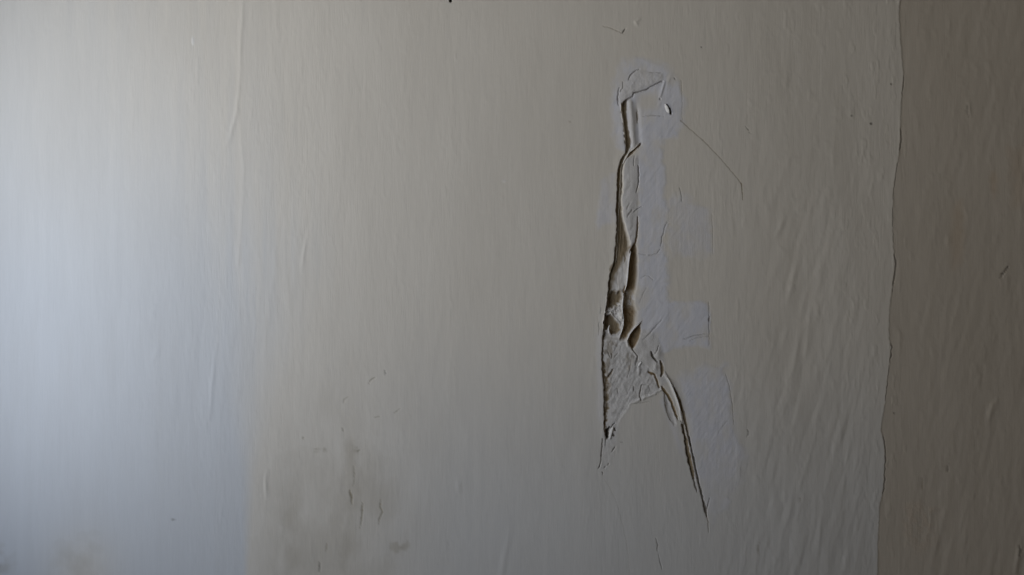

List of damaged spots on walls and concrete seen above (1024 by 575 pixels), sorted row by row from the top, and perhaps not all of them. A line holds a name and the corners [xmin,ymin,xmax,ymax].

flaking render [591,68,710,575]